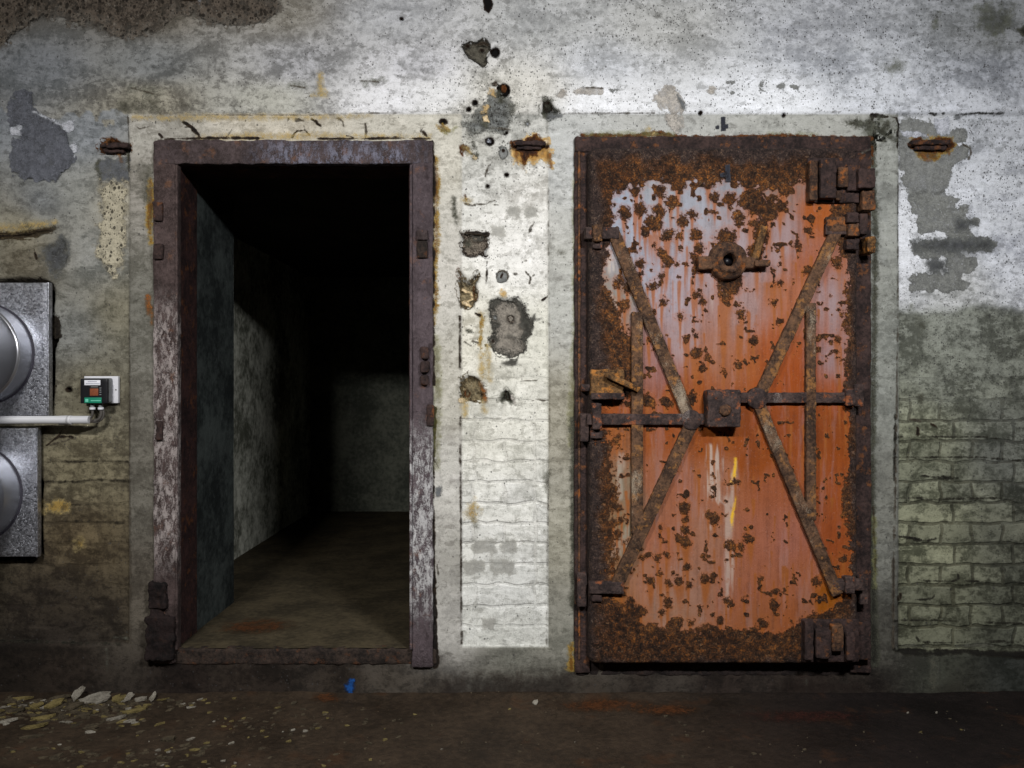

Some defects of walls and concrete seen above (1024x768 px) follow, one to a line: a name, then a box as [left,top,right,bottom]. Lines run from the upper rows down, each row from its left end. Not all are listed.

flaking render [0,0,284,47]
flaking render [461,37,491,68]
flaking render [6,88,78,183]
corrosion [95,136,133,158]
spalling [459,81,530,160]
corrosion [509,133,555,173]
corrosion [580,128,701,137]
corrosion [715,133,873,141]
corrosion [910,136,957,161]
peeling [898,116,998,293]
flaking render [454,206,537,310]
flaking render [459,372,487,416]